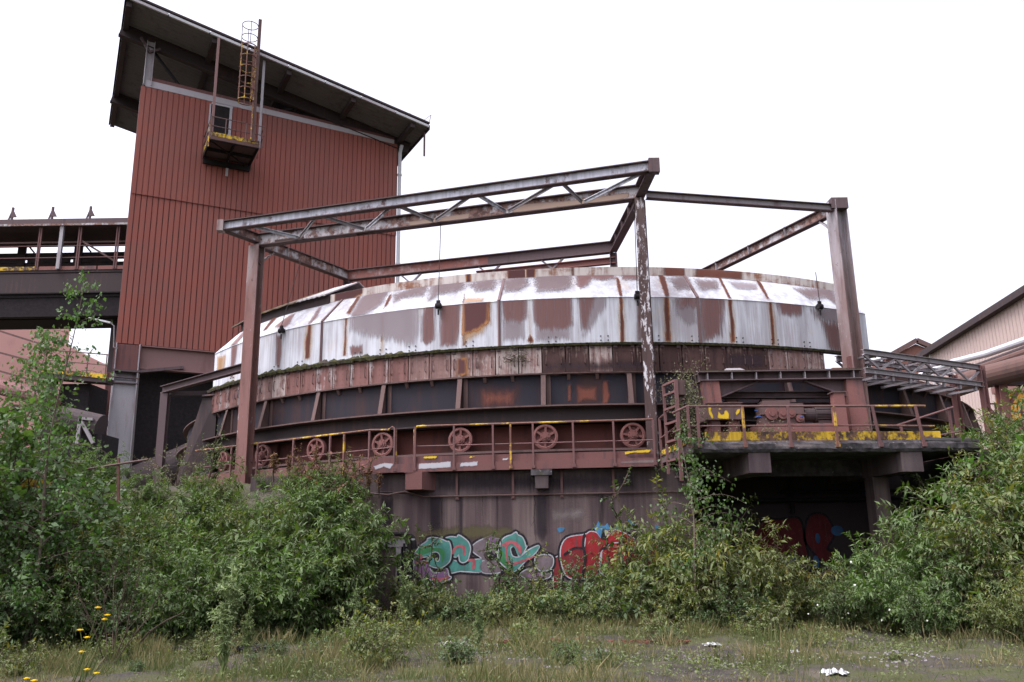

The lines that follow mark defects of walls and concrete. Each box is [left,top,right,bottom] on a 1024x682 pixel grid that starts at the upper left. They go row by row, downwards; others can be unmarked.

rust [457,274,490,376]
rust [616,278,624,342]
rust [658,267,742,343]
rust [757,281,776,345]
rust [482,391,514,406]
rust [568,381,610,403]
damp [416,475,634,540]